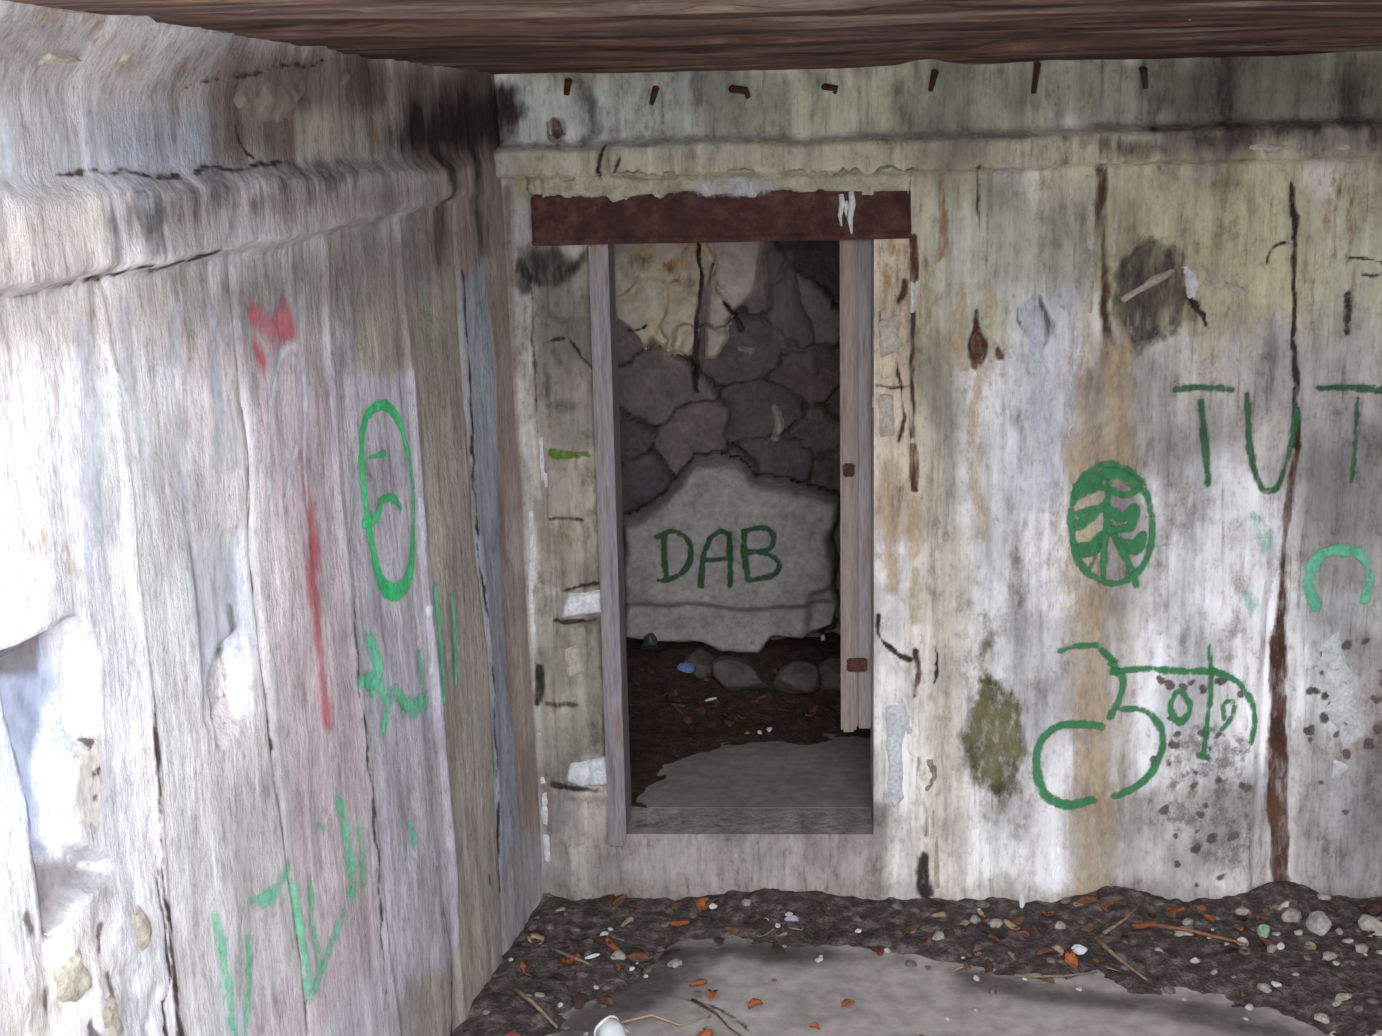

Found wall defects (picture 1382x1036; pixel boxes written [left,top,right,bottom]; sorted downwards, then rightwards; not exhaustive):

crack [186,59,324,89]
crack [58,125,282,180]
crack [62,250,221,286]
rust [950,287,1004,532]
crack [1266,181,1301,882]
spalling [0,634,79,935]
spalling [71,738,103,828]
spalling [132,905,152,952]
spalling [43,923,124,1036]